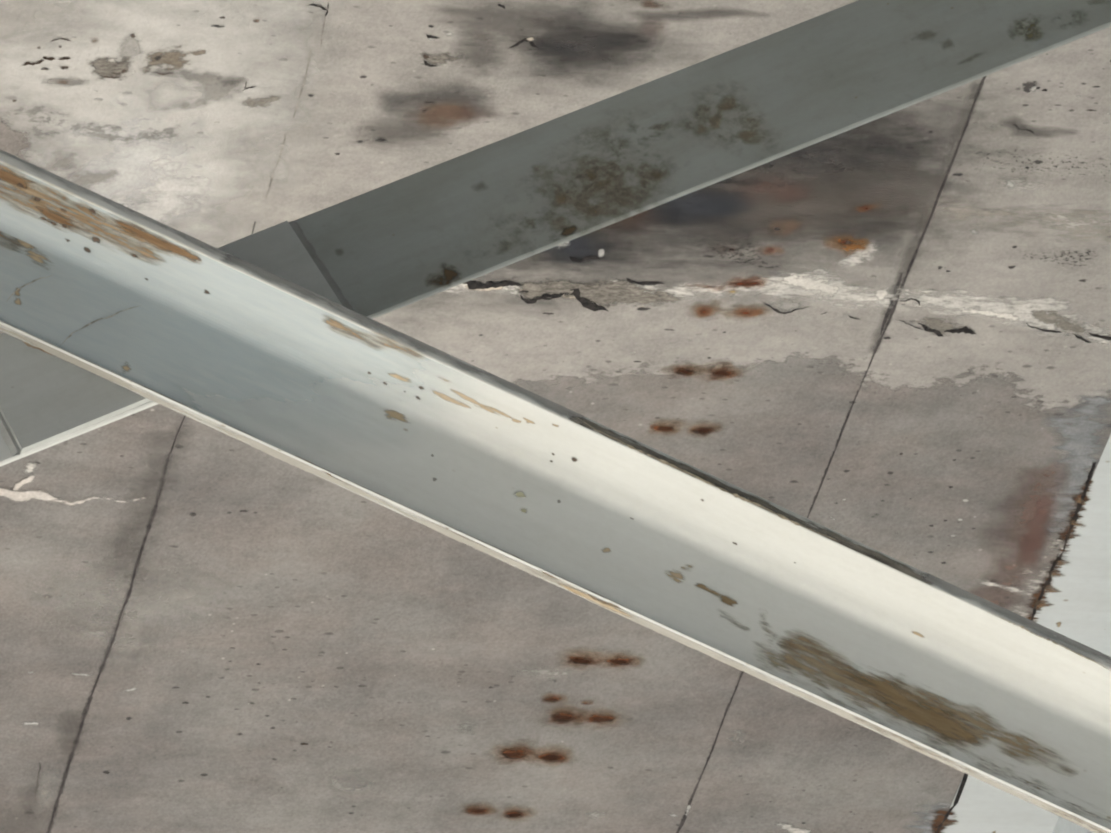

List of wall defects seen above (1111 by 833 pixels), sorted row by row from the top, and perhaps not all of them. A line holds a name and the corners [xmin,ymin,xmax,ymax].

damp [0,0,858,248]
damp [372,27,1111,553]
crack [895,298,976,337]
crack [1027,310,1111,343]
rust [670,363,736,379]
rust [1027,462,1096,622]
damp [1013,567,1051,616]
rust [569,653,639,665]
rust [544,695,615,724]
rust [502,745,569,763]
rust [466,805,528,819]
rust [931,769,969,833]